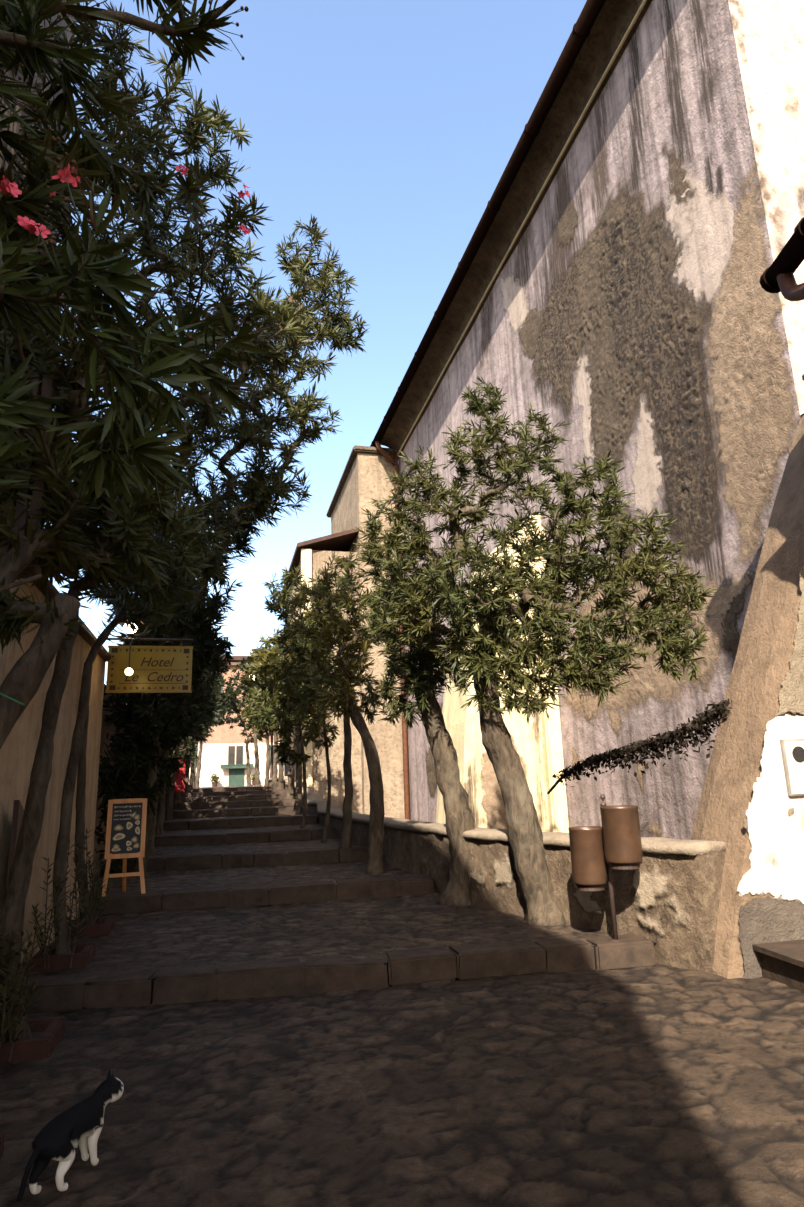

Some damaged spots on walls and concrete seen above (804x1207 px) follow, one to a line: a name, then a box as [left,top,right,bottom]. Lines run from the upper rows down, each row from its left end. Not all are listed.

water stain [660,0,690,159]
water stain [691,0,715,122]
water stain [480,287,493,364]
water stain [514,85,608,406]
water stain [604,29,725,582]
water stain [755,144,778,222]